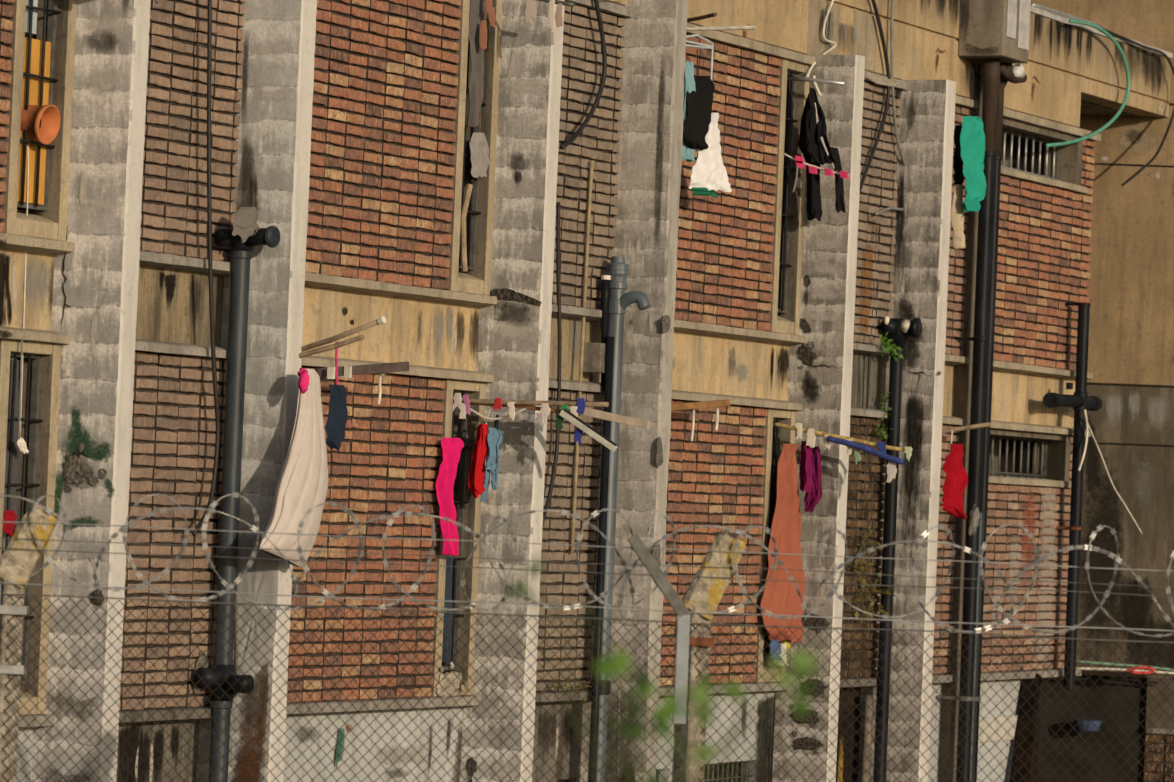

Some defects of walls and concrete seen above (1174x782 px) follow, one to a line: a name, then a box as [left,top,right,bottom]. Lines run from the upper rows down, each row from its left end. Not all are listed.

water stain [922,0,993,95]
water stain [1035,14,1092,57]
water stain [1116,42,1165,82]
water stain [908,107,927,142]
water stain [894,175,933,273]
water stain [0,240,54,338]
crack [60,226,75,382]
water stain [899,299,914,321]
water stain [770,349,789,383]
water stain [802,377,819,401]
water stain [72,410,82,435]
water stain [901,336,924,557]